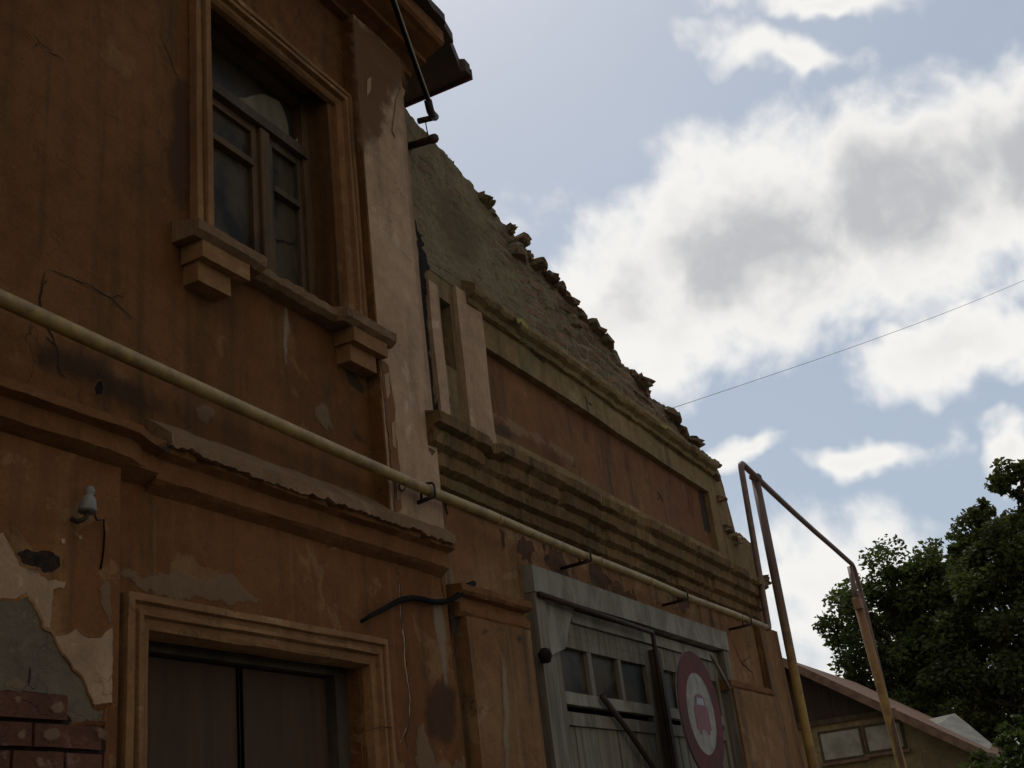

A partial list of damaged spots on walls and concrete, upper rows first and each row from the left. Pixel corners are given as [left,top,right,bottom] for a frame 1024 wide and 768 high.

crack [39,267,132,379]
flaking render [0,533,115,768]